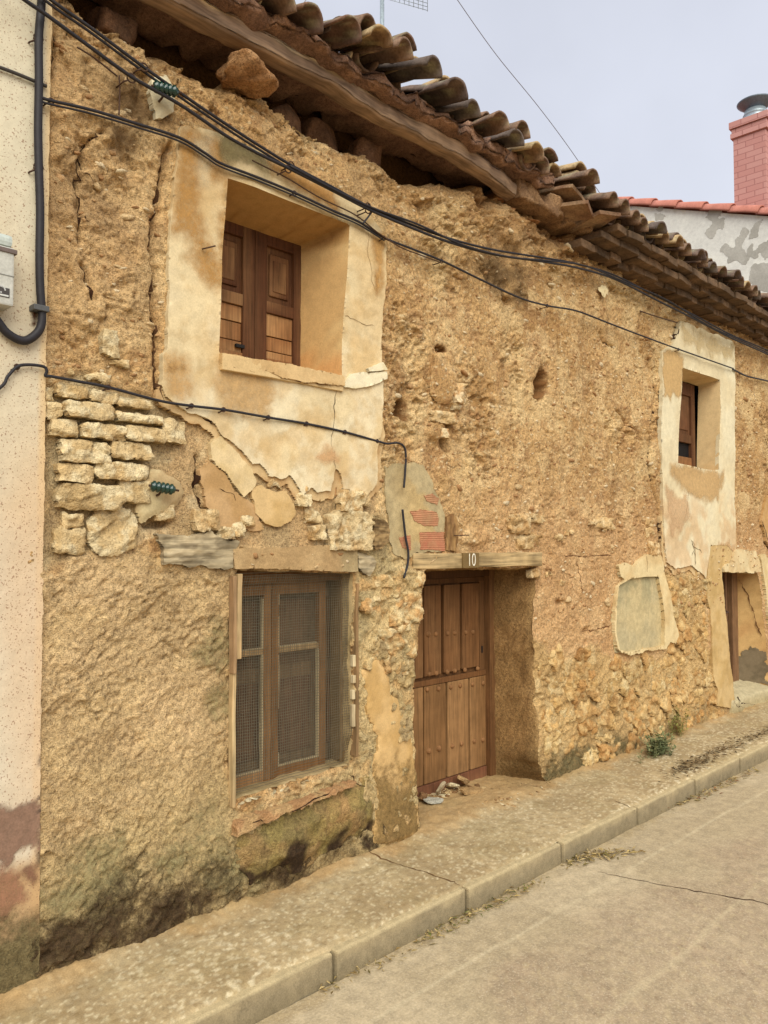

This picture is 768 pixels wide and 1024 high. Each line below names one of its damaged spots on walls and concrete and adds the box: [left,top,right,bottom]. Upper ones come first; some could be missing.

crack [73,132,102,241]
crack [147,151,165,399]
peeling [705,210,768,292]
spalling [45,328,187,557]
flaking render [190,436,375,551]
flaking render [758,495,768,627]
spalling [359,565,426,844]
leakage [0,862,241,994]
leakage [266,856,311,888]
crack [603,872,766,904]